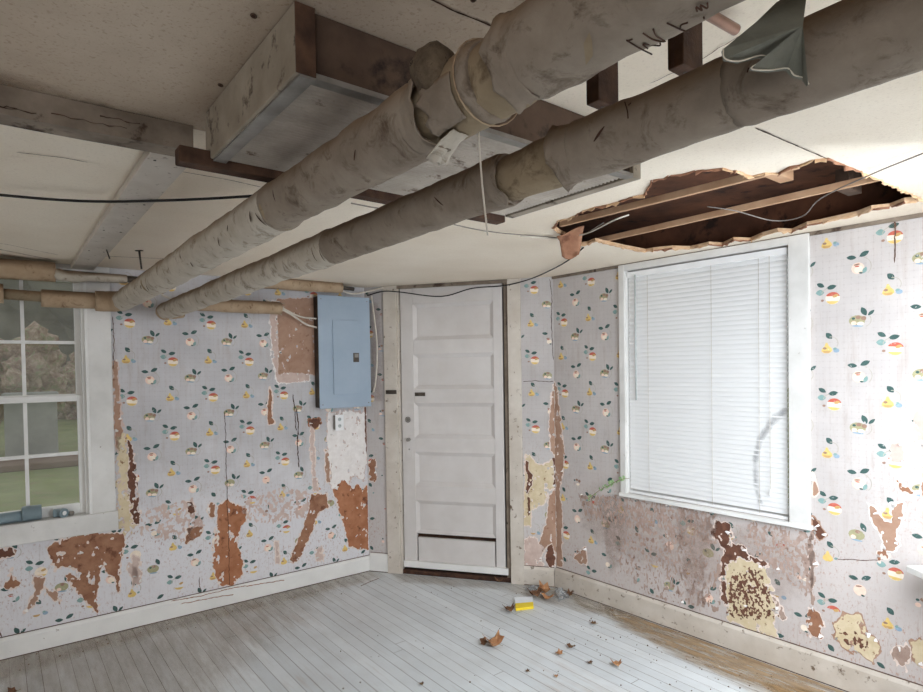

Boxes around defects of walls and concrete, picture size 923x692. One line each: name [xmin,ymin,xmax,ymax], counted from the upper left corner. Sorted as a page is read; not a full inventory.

crack [432,0,491,26]
spalling [551,158,923,260]
spalling [307,417,322,430]
peeling [525,460,533,516]
flaking render [707,521,797,620]
flaking render [835,631,878,653]